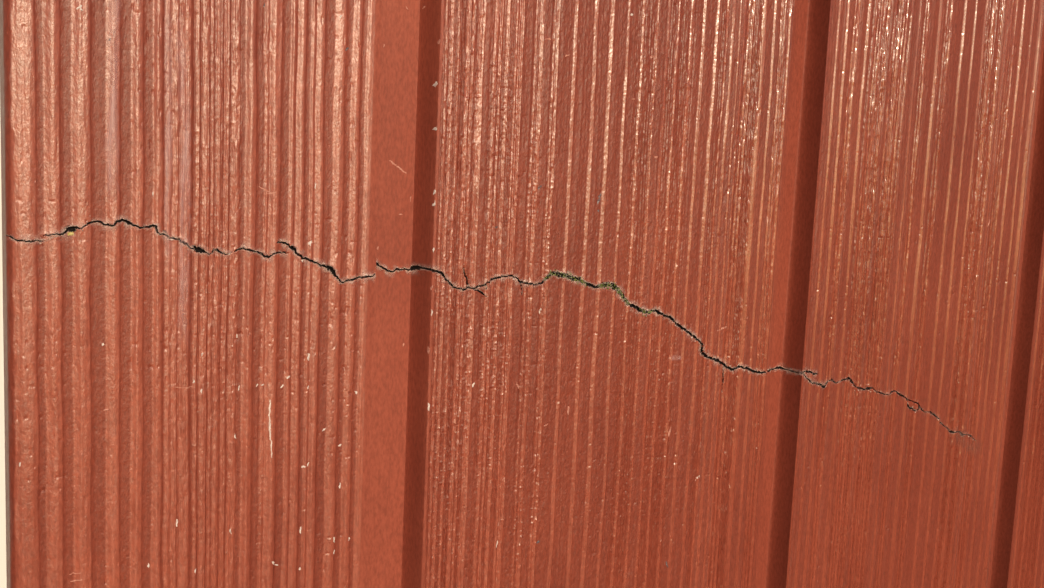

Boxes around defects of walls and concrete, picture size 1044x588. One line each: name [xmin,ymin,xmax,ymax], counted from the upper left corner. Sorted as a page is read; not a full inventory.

crack [6,218,975,440]